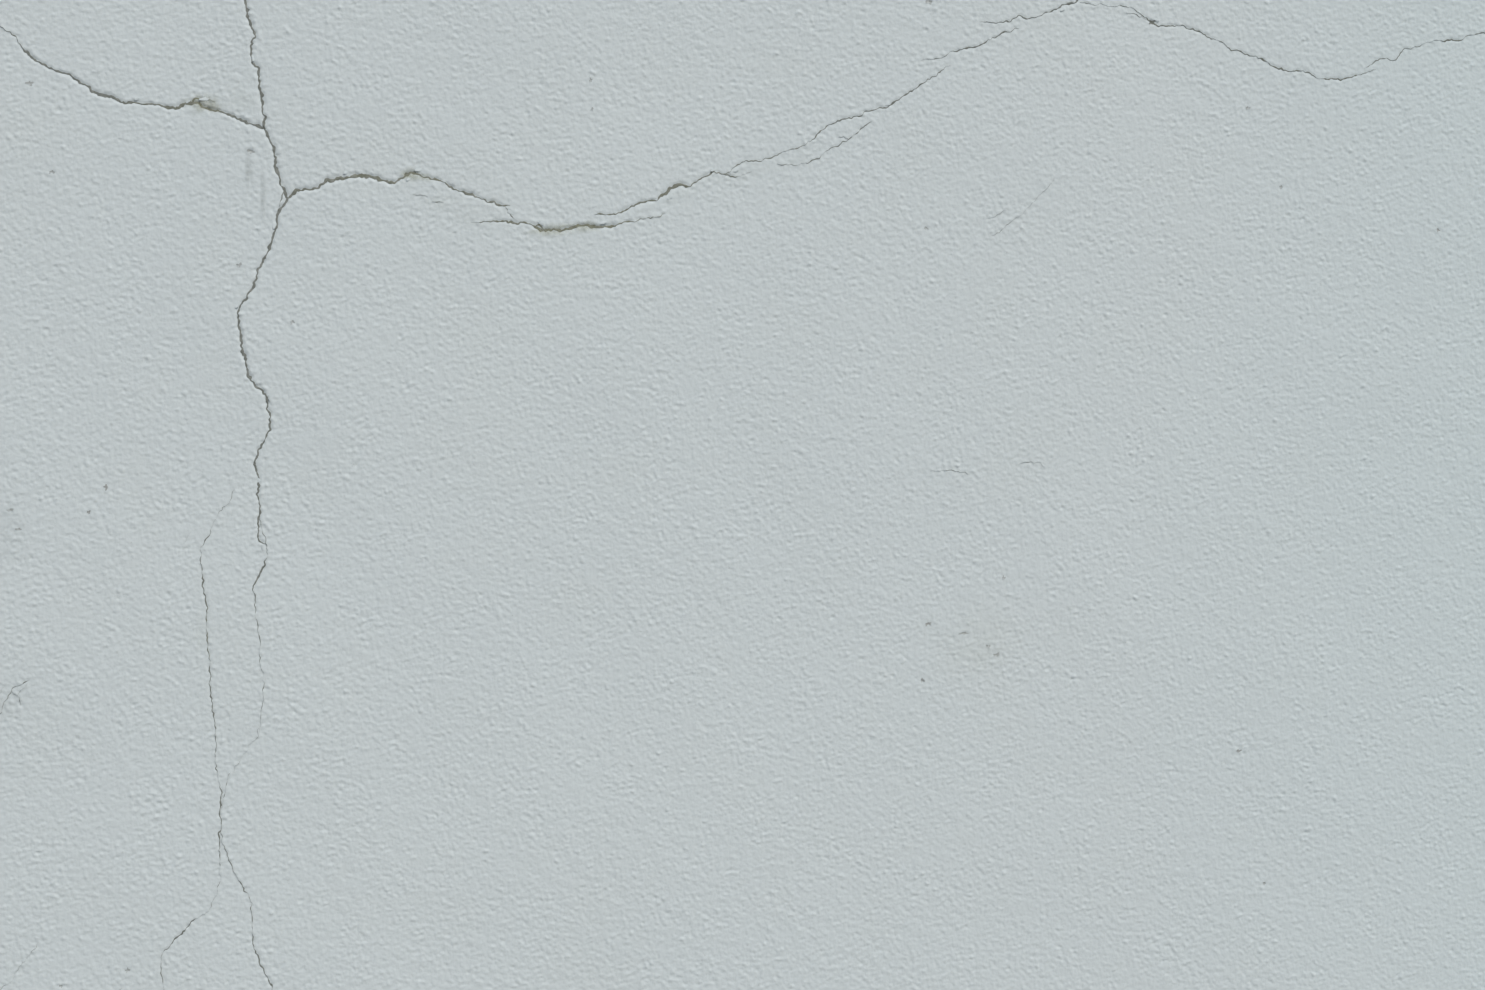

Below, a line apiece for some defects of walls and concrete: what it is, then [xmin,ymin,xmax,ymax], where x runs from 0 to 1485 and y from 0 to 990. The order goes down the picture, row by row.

crack [160,497,273,988]
crack [0,0,1484,759]